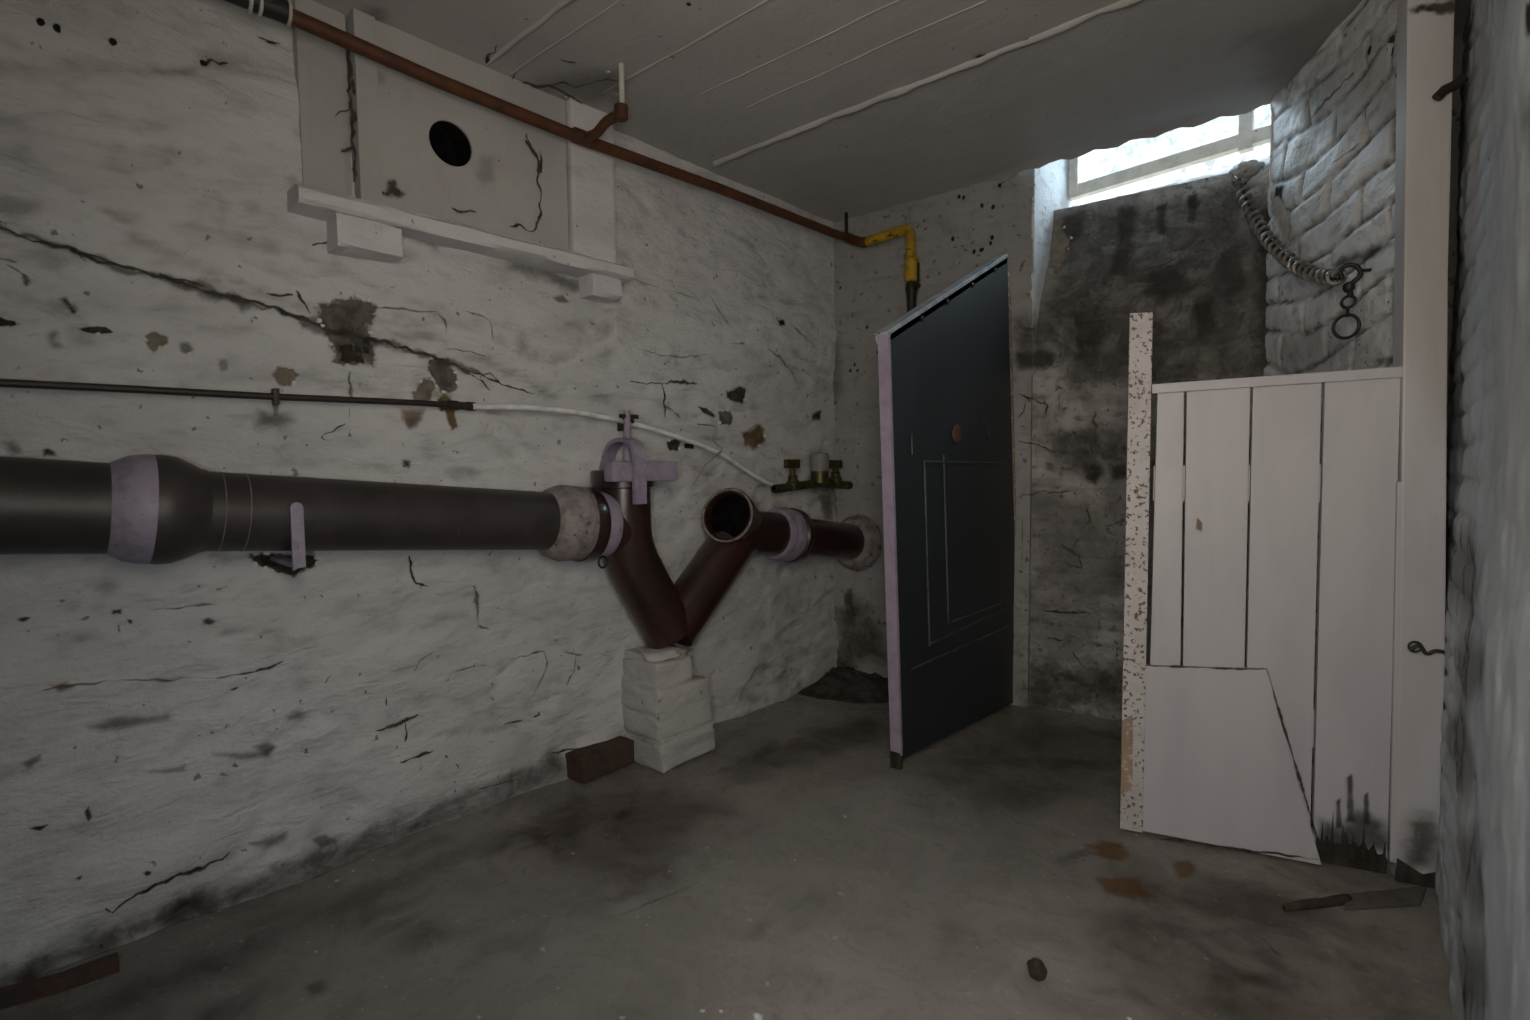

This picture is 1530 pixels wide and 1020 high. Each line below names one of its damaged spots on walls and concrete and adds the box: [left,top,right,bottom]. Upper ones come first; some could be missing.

crack [335,50,357,182]
crack [510,134,543,232]
damp [1017,187,1271,382]
peeling [143,332,192,356]
crack [0,225,533,440]
peeling [273,366,297,386]
spalling [316,296,378,366]
spalling [412,358,460,400]
damp [1320,775,1388,850]
crack [105,852,229,914]